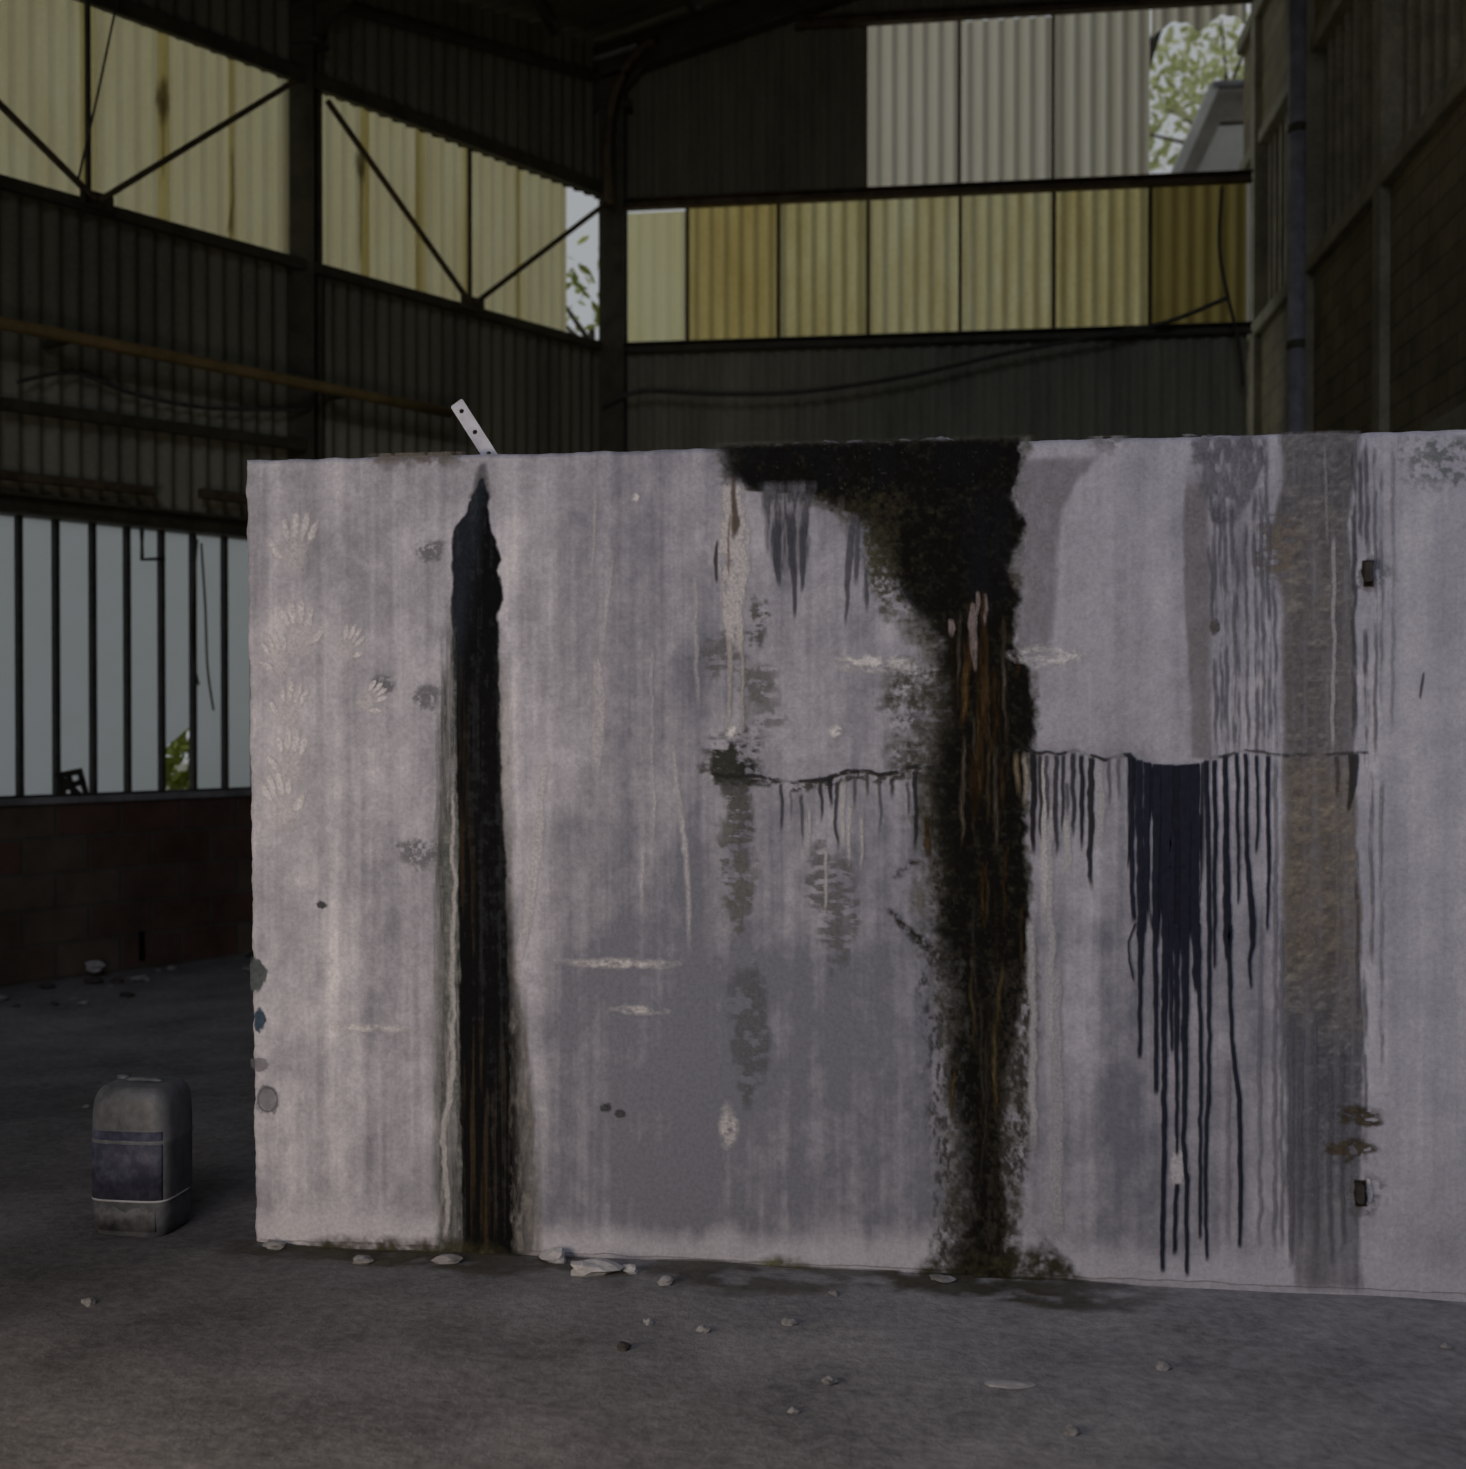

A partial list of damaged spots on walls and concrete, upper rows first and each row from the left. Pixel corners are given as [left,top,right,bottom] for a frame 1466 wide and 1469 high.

water stain [436,476,547,1256]
water stain [676,780,690,922]
water stain [700,437,1119,1279]
rust [950,593,1020,837]
water stain [1170,1149,1188,1186]
water stain [1184,436,1277,756]
water stain [1257,765,1345,1254]
water stain [1330,448,1395,809]
water stain [1355,787,1383,1047]